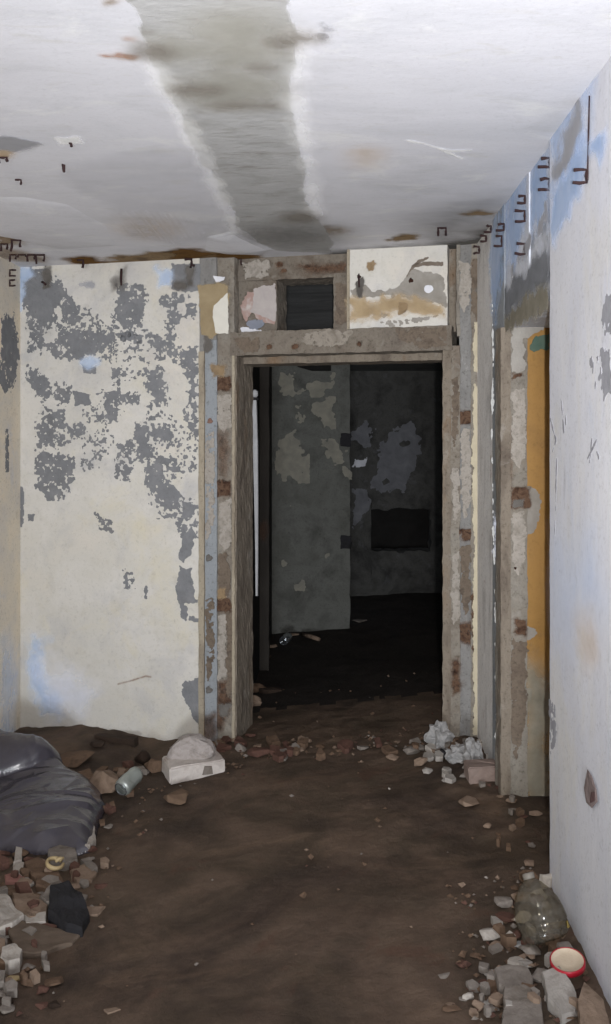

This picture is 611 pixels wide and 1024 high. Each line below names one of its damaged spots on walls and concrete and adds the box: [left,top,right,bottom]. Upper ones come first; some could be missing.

corrosion [65,249,260,264]
peeling [213,293,276,334]
peeling [0,263,232,725]
peeling [275,372,422,529]
peeling [300,259,477,735]
spalling [510,388,527,468]
spalling [511,486,542,575]
spalling [584,769,598,808]